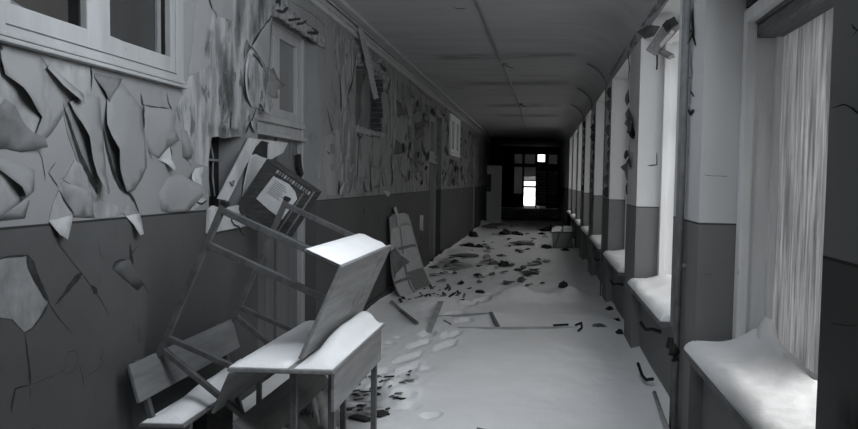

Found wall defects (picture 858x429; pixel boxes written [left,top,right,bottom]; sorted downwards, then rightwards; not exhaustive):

peeling [0,0,390,240]
peeling [404,95,430,185]
peeling [442,117,490,187]
peeling [582,87,611,200]
peeling [621,150,631,195]
peeling [624,89,635,139]
flaking render [0,255,50,332]
crack [11,243,109,412]